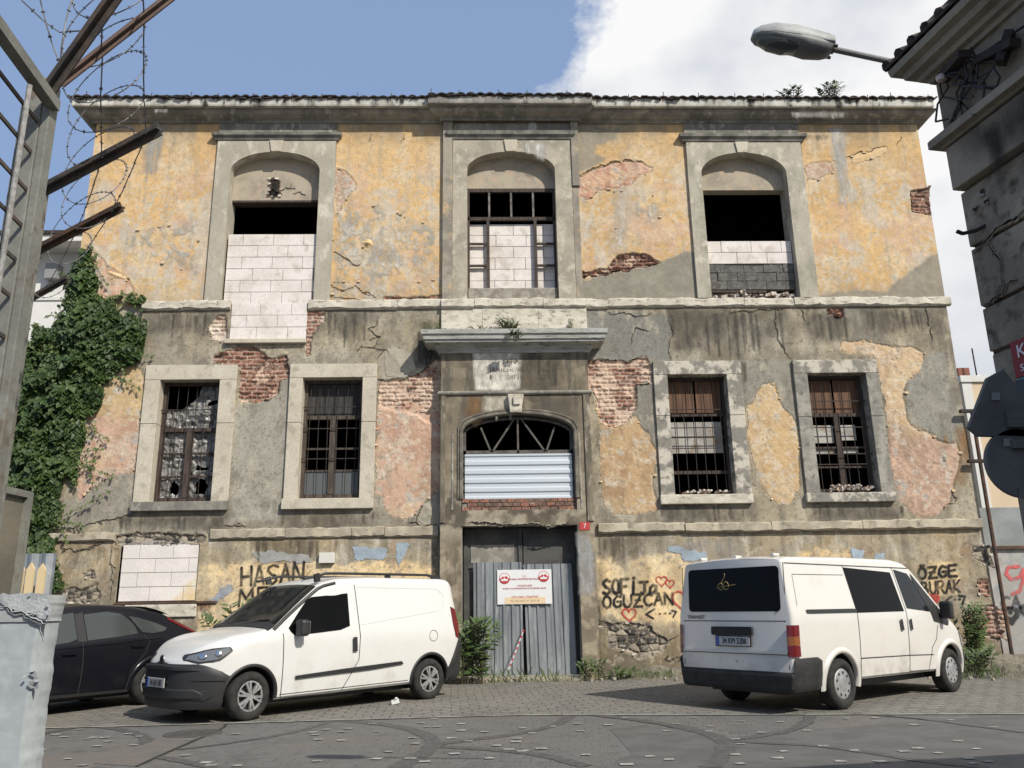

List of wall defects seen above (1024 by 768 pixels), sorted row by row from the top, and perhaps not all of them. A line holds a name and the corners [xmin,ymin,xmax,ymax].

flaking render [208,315,290,403]
flaking render [305,310,325,356]
crack [335,251,438,382]
flaking render [575,159,662,277]
leakage [672,311,760,381]
flaking render [910,185,932,215]
crack [972,209,1024,308]
flaking render [375,360,441,519]
flaking render [587,356,658,515]
flaking render [746,382,801,505]
flaking render [839,340,963,518]
flaking render [599,622,669,658]